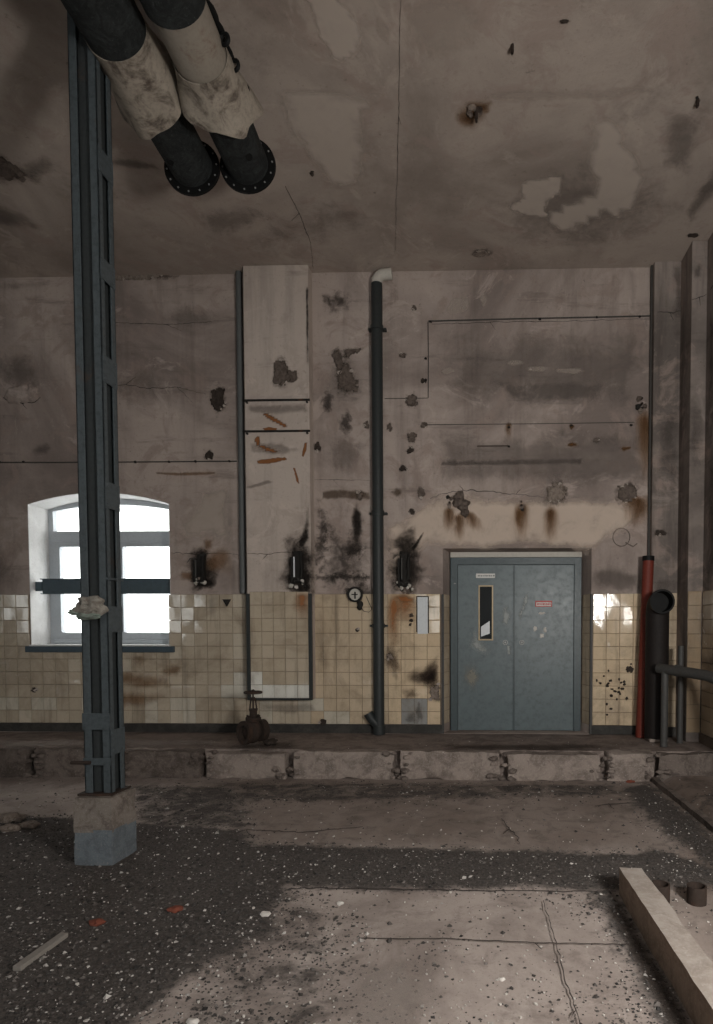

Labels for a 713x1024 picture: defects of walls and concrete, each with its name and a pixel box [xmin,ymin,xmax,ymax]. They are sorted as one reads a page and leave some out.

peeling [511,122,642,230]
spalling [272,359,297,387]
spalling [331,348,361,392]
spalling [210,387,227,412]
rust [445,509,476,531]
peeling [388,482,637,576]
rust [516,505,526,527]
rust [546,509,555,532]
rust [390,596,413,630]
crack [291,887,629,1024]